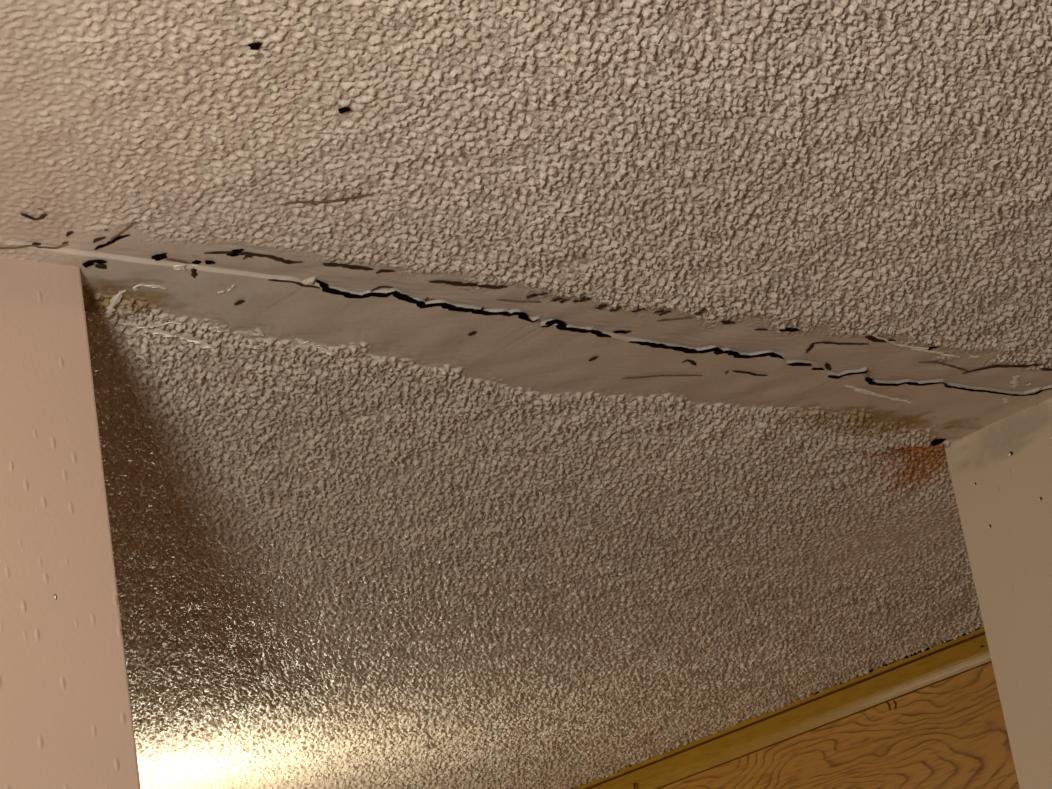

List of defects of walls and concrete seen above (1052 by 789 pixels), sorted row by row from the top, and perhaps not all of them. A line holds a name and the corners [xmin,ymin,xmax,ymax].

crack [0,208,137,269]
flaking render [151,253,199,270]
peeling [105,283,166,317]
spalling [526,292,671,316]
peeling [122,321,264,349]
crack [165,251,1052,396]
peeling [872,335,980,359]